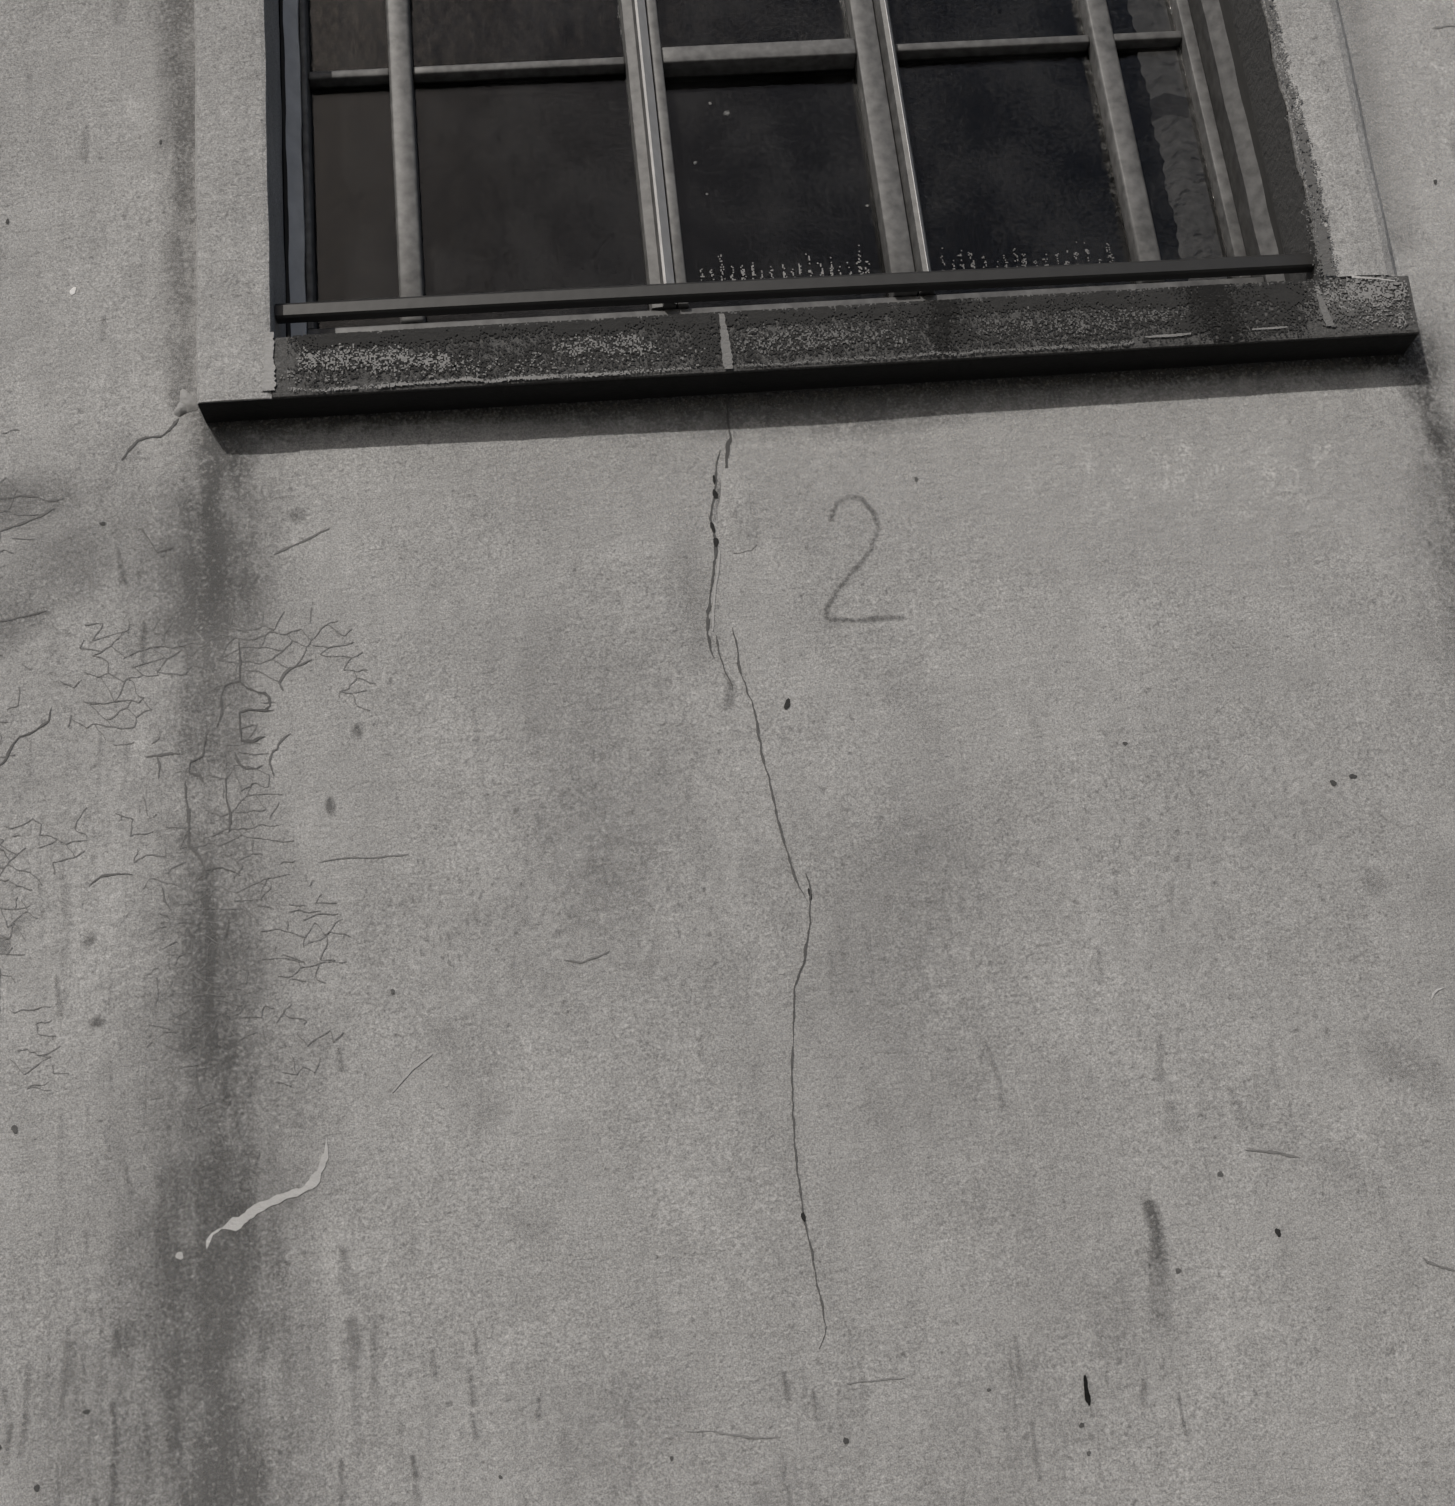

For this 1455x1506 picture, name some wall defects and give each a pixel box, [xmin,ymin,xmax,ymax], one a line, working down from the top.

water stain [163,415,259,705]
water stain [158,833,267,1506]
peeling [206,1138,329,1249]
crack [706,394,826,1349]